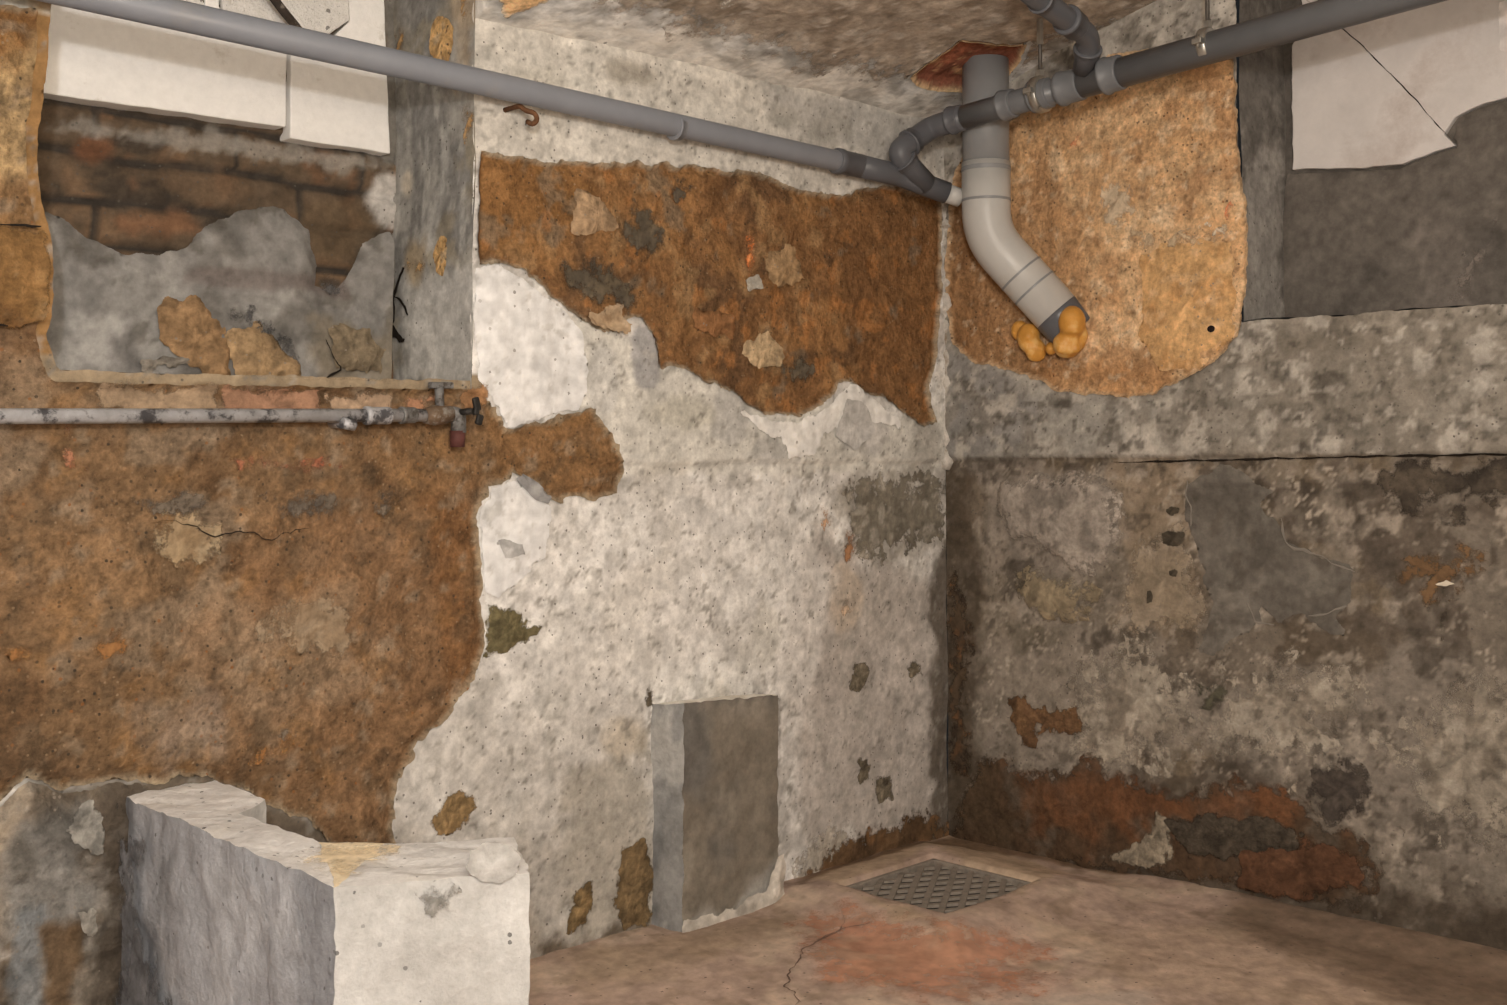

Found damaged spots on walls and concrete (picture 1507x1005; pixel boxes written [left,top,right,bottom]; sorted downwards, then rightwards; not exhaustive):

spalling [429,16,453,61]
spalling [500,0,548,18]
spalling [0,58,1248,1005]
leakage [1377,457,1507,527]
leakage [946,571,975,777]
corrosion [952,754,1384,913]
leakage [1060,623,1372,828]
leakage [1368,675,1507,855]